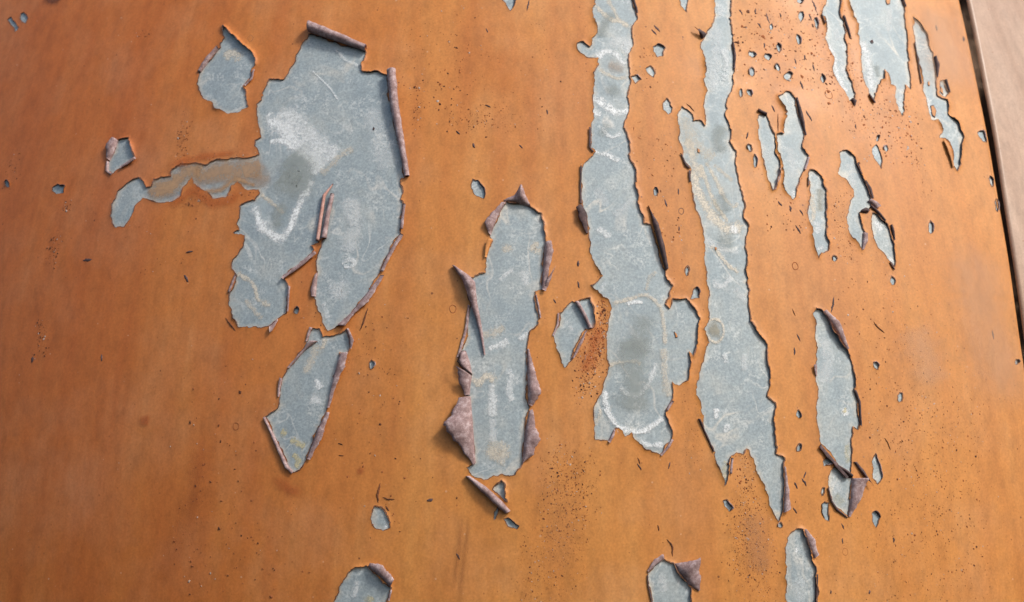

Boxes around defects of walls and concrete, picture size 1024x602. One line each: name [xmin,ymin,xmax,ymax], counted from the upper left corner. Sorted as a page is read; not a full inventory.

rust [399,23,543,138]
rust [732,0,932,201]
peeling [796,0,987,171]
peeling [110,20,410,474]
peeling [443,184,554,520]
rust [515,436,602,601]
rust [572,295,610,405]
peeling [552,0,838,602]
rust [721,456,783,602]
peeling [813,307,883,521]
peeling [838,149,897,285]
rust [833,257,989,602]